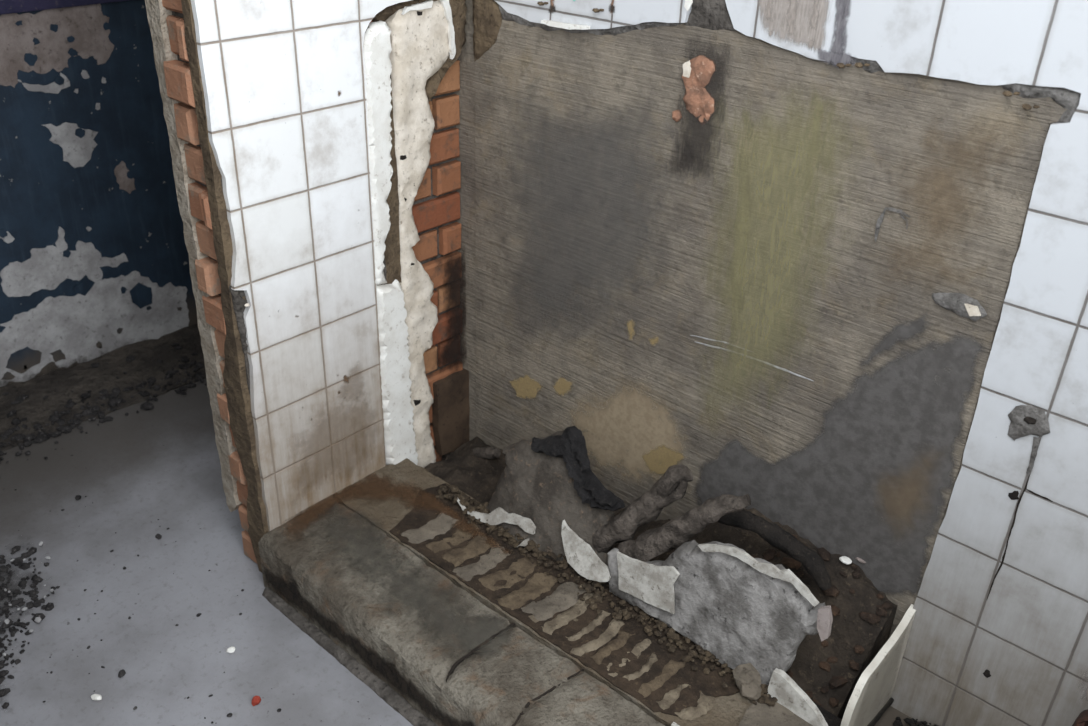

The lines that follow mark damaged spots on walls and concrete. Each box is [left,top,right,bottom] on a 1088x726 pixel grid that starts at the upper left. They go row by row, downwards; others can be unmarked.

spalling [497,3,683,35]
peeling [0,4,114,94]
spalling [672,55,715,122]
leakage [671,47,726,173]
spalling [828,56,888,73]
spalling [998,83,1081,123]
peeling [43,122,98,168]
peeling [114,161,135,194]
flaking render [385,0,456,468]
peeling [0,226,189,387]
spalling [932,293,987,321]
crack [446,623,516,682]